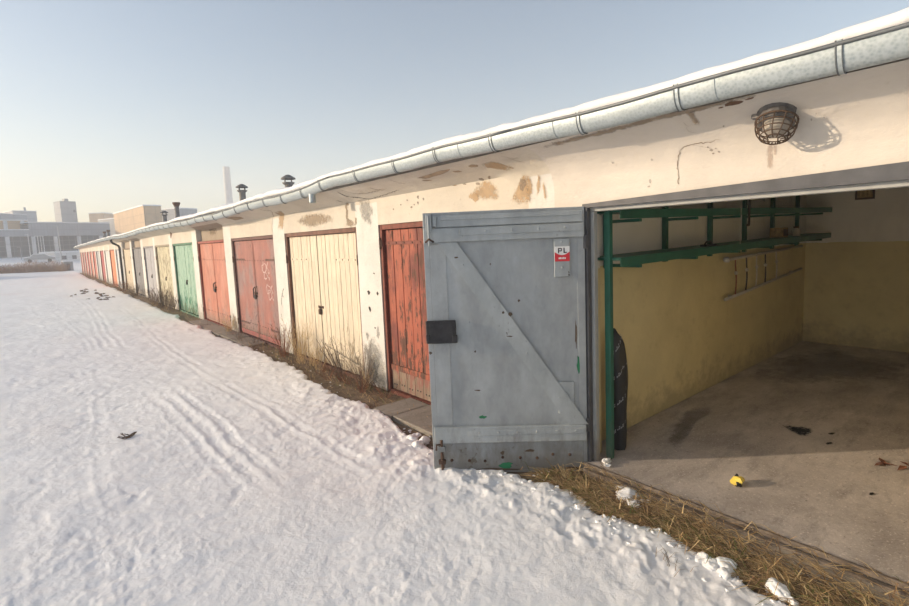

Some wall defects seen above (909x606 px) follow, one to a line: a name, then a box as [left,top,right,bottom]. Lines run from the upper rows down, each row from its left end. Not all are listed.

crack [677,122,719,184]